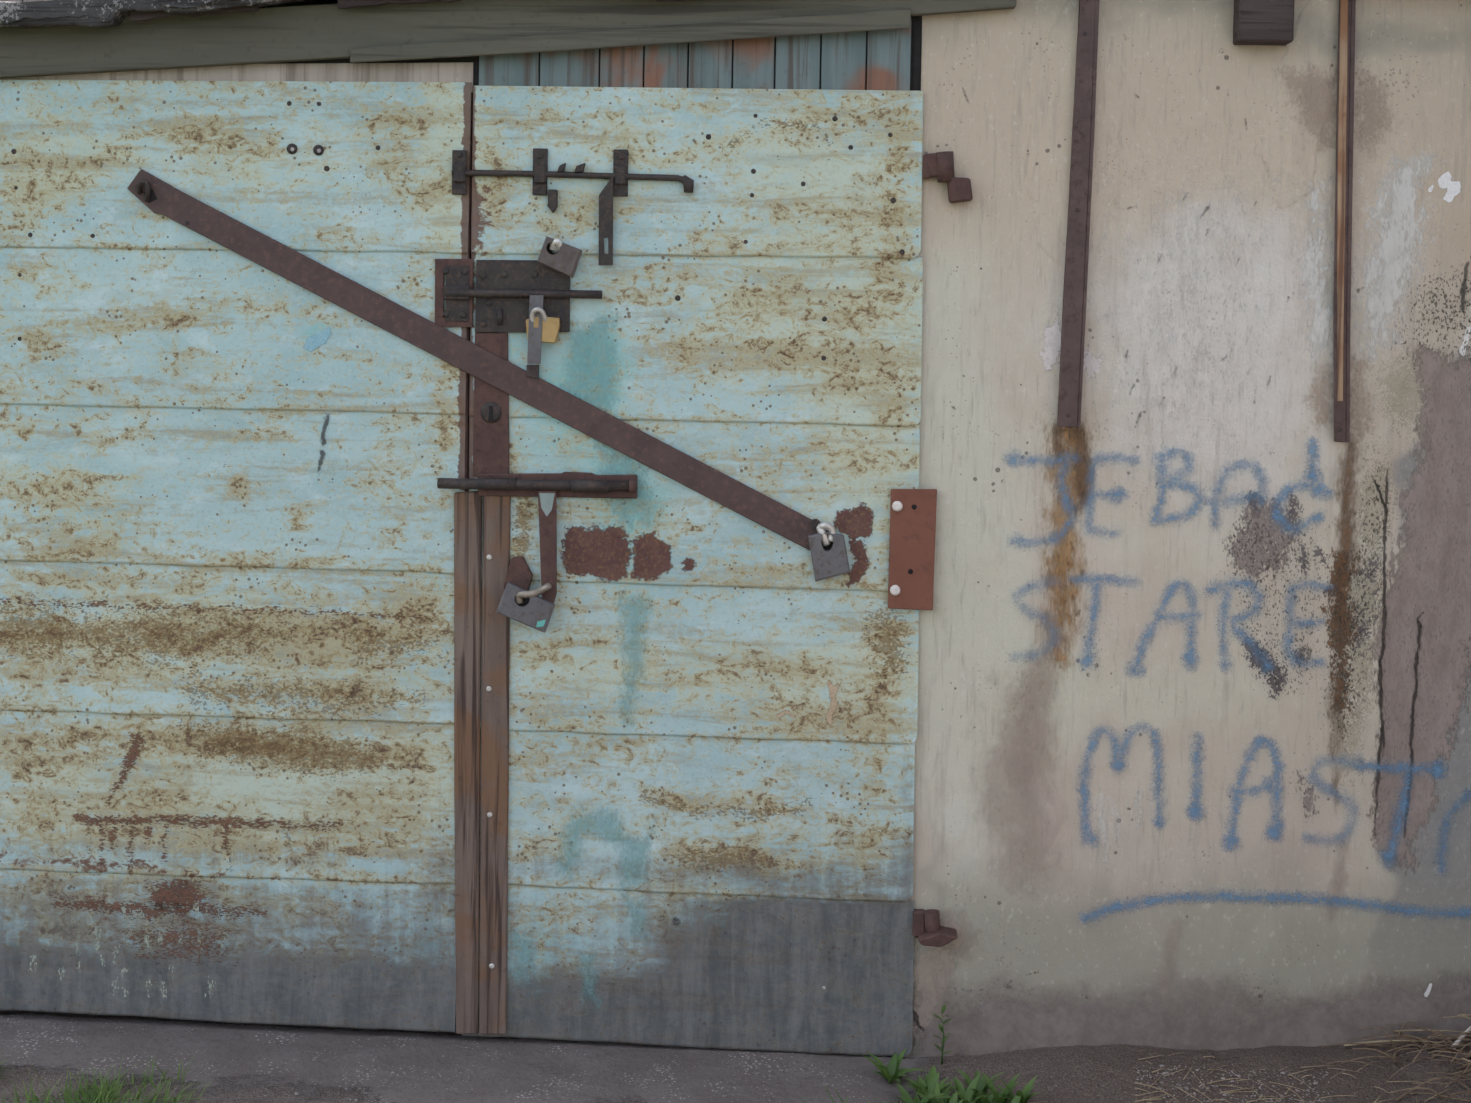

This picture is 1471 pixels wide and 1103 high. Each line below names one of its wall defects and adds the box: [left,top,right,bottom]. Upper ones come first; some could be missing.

spalling [1428,172,1461,203]
rust [0,597,432,622]
rust [561,523,696,583]
rust [833,502,874,588]
rust [1044,425,1094,666]
rust [1320,443,1360,785]
water stain [1220,157,1471,870]
crack [1371,469,1424,838]
rust [51,732,340,969]